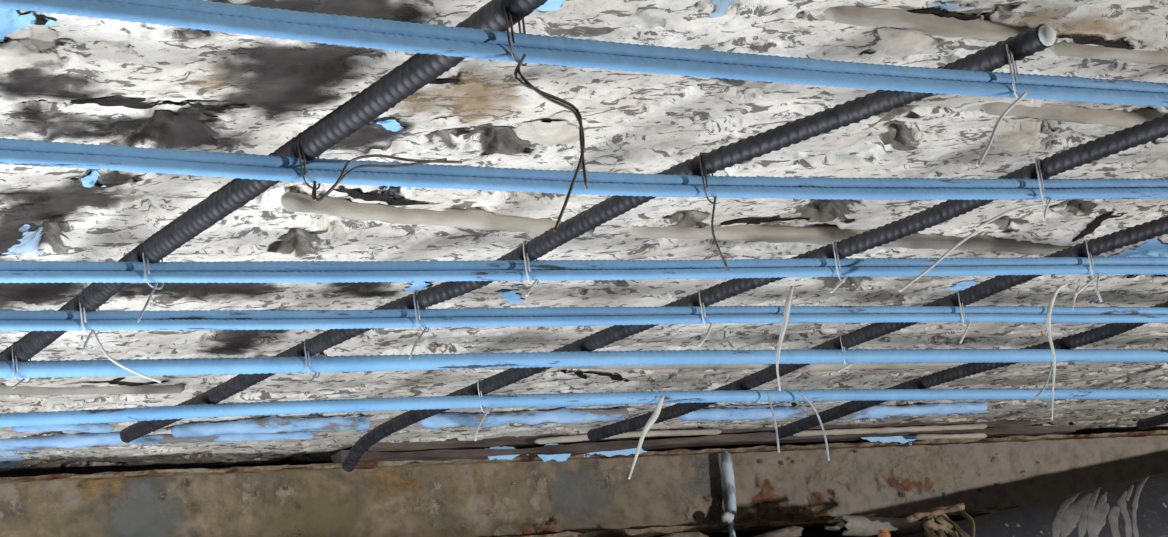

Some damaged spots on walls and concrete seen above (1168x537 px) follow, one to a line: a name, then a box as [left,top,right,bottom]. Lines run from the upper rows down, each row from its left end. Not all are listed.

corrosion [739,477,838,524]
corrosion [877,472,933,494]